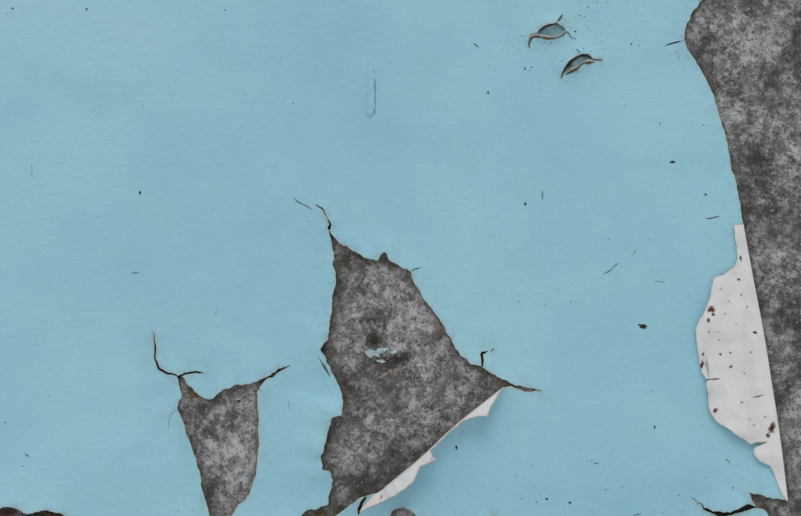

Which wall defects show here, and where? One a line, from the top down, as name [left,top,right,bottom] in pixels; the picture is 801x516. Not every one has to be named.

peeling [665,0,801,516]
peeling [0,507,64,516]
peeling [154,339,290,516]
peeling [294,198,541,516]
crack [691,497,757,516]